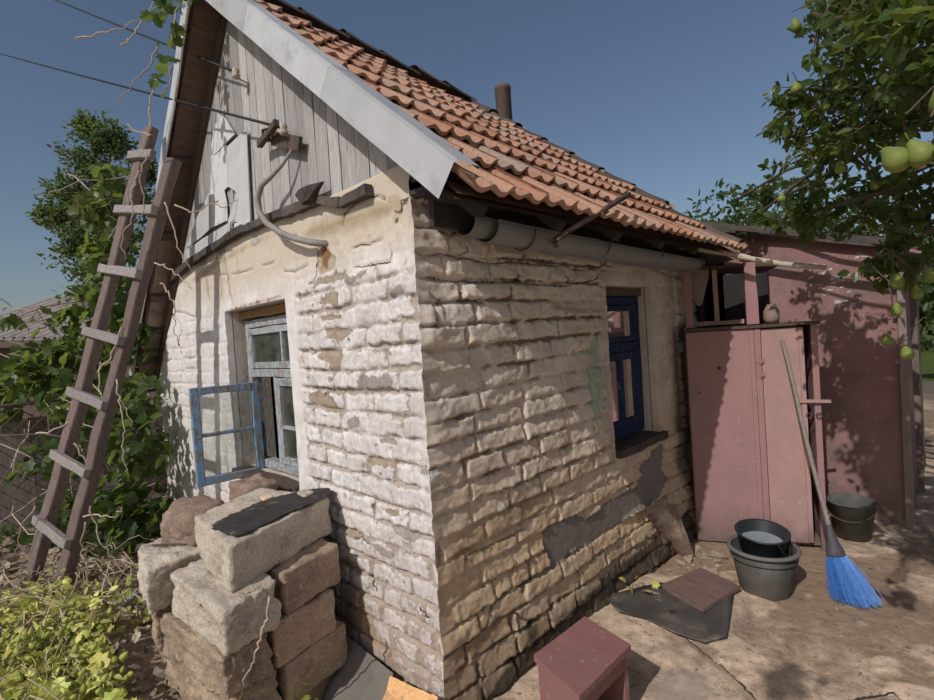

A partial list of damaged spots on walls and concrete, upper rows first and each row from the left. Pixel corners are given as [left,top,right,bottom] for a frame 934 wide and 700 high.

spalling [388,284,403,296]
peeling [808,256,860,306]
spalling [304,246,393,429]
spalling [362,437,399,475]
spalling [341,524,363,540]
spalling [370,503,421,542]
spalling [542,444,667,569]
damp [681,510,696,542]
spalling [341,558,365,578]
damp [478,534,677,700]
crack [682,636,757,700]
crack [848,692,902,700]